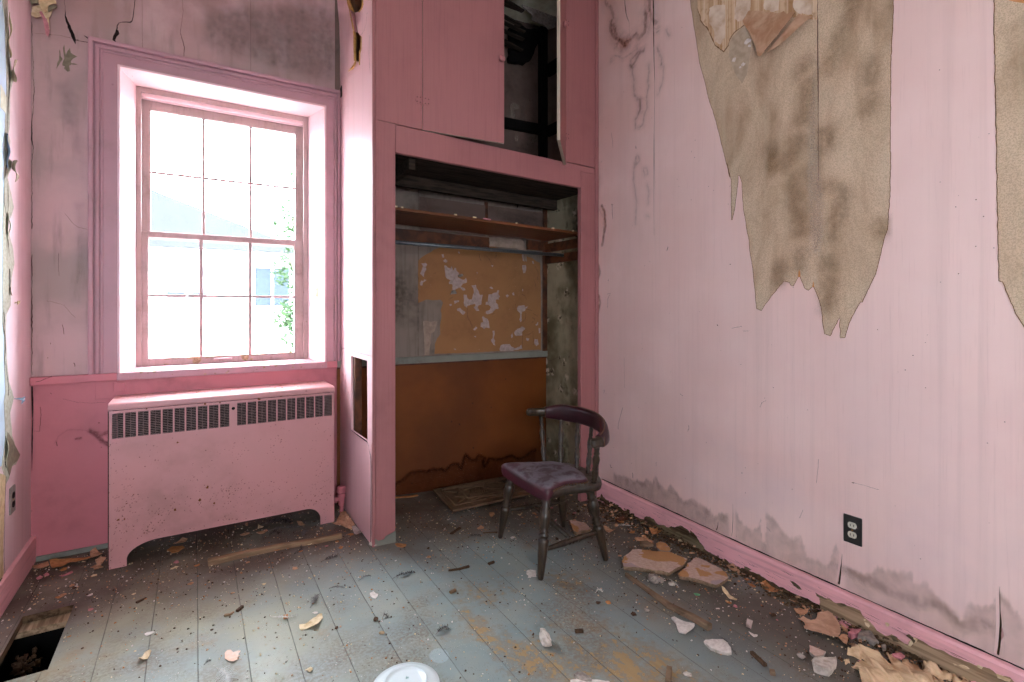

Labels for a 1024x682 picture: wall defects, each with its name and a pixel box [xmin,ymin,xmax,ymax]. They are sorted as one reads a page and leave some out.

crack [31,0,143,229]
peeling [690,0,894,338]
peeling [993,0,1024,327]
crack [28,256,36,455]
peeling [418,244,541,354]
peeling [600,494,1014,682]